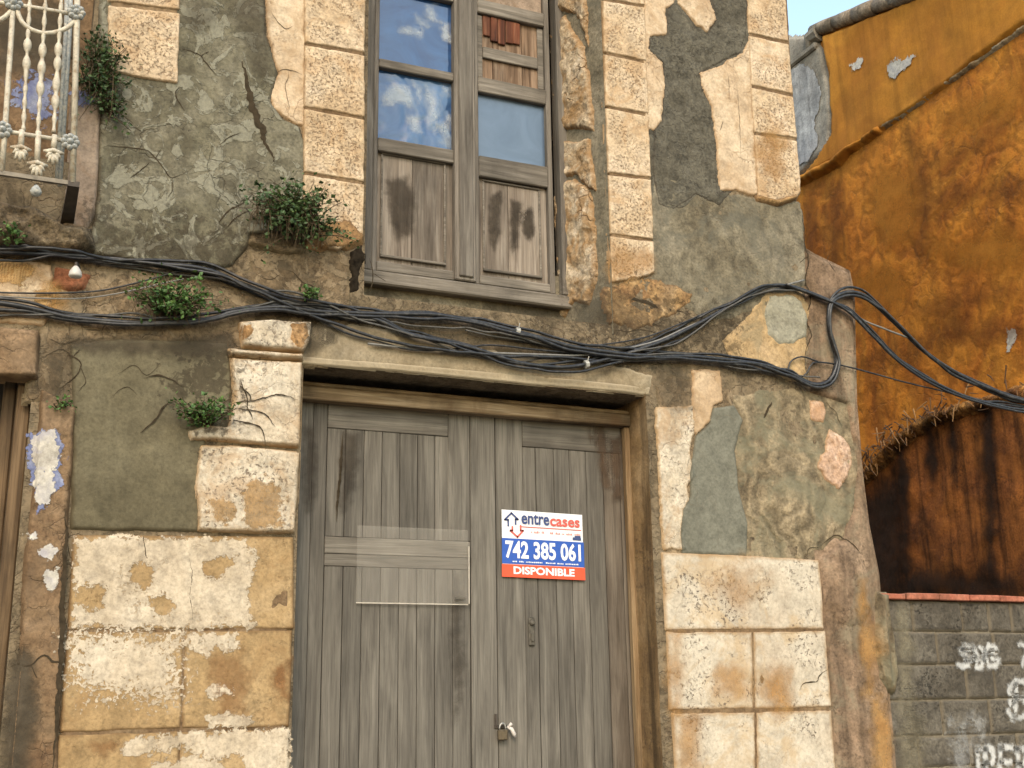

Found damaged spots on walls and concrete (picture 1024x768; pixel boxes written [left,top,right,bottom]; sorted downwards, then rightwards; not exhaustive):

spalling [648,0,748,209]
peeling [791,64,821,165]
peeling [887,54,916,79]
leakage [389,179,413,234]
leakage [489,192,535,248]
peeling [25,428,65,515]
peeling [681,405,747,556]
leakage [866,404,1021,596]
peeling [22,473,293,768]